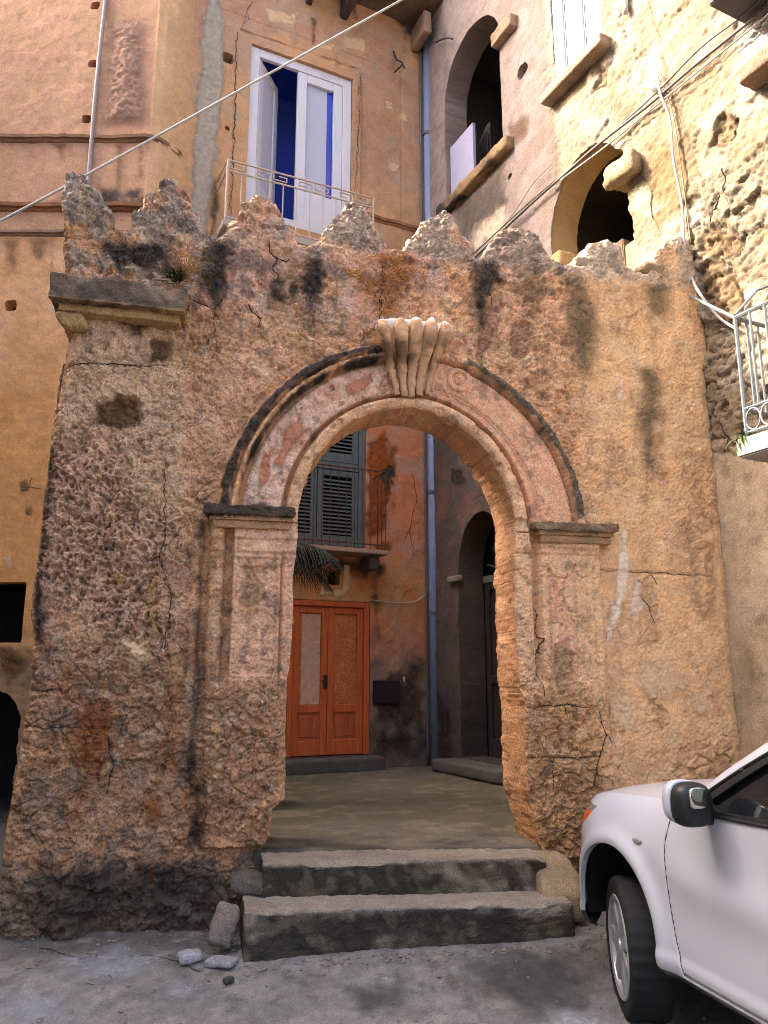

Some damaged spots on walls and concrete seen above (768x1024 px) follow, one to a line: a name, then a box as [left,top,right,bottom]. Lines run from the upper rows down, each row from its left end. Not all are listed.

crack [229,5,251,214]
crack [269,242,290,283]
leakage [639,369,659,457]
crack [149,471,177,688]
efflorescence [607,530,642,640]
crack [602,569,694,623]
crack [527,610,612,791]
leakage [37,865,231,937]